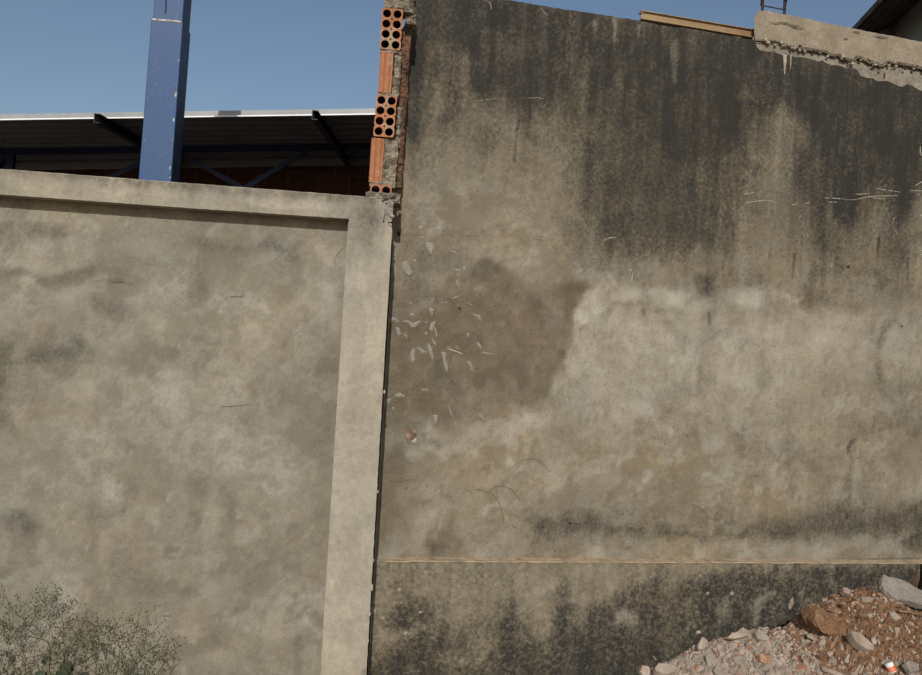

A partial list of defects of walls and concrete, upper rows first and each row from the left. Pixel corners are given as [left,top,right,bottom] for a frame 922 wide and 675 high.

spalling [378,31,411,238]
peeling [389,267,473,372]
leakage [354,0,922,675]